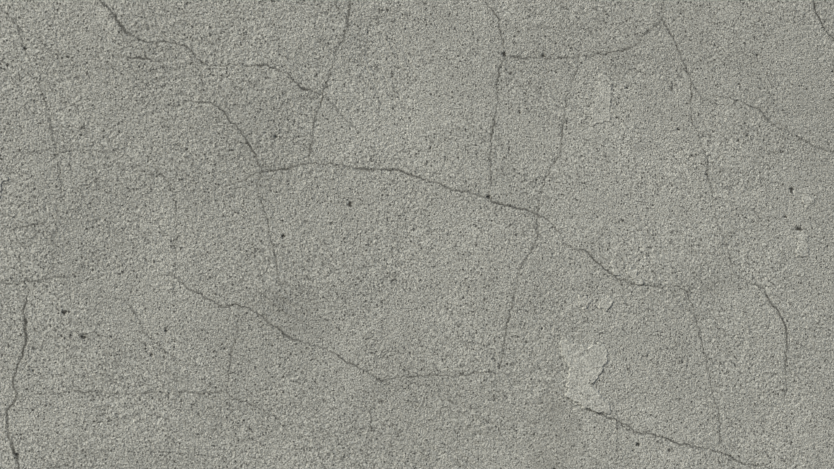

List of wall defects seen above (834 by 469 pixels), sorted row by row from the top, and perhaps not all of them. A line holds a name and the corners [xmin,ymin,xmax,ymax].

crack [6,297,28,420]
peeling [560,339,611,414]